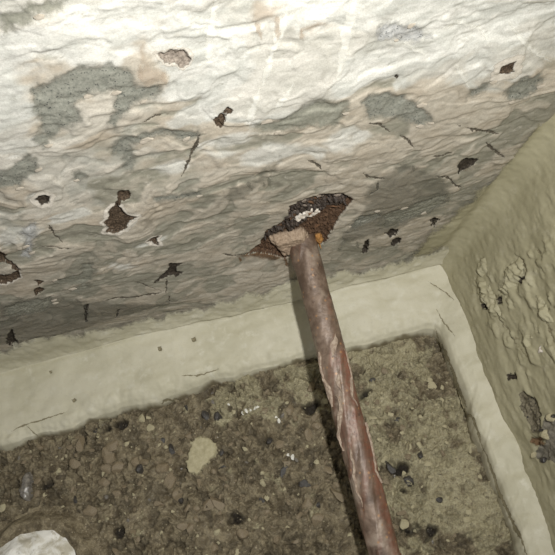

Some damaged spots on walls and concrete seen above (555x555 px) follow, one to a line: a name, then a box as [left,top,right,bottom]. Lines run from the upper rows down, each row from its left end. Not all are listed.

spalling [153,47,194,70]
spalling [470,55,545,104]
spalling [213,107,233,128]
crack [181,135,200,177]
spalling [458,158,478,174]
spalling [29,192,57,209]
spalling [100,190,142,236]
spalling [245,193,353,258]
spalling [0,252,23,285]
spalling [154,263,182,283]
spalling [519,391,555,463]